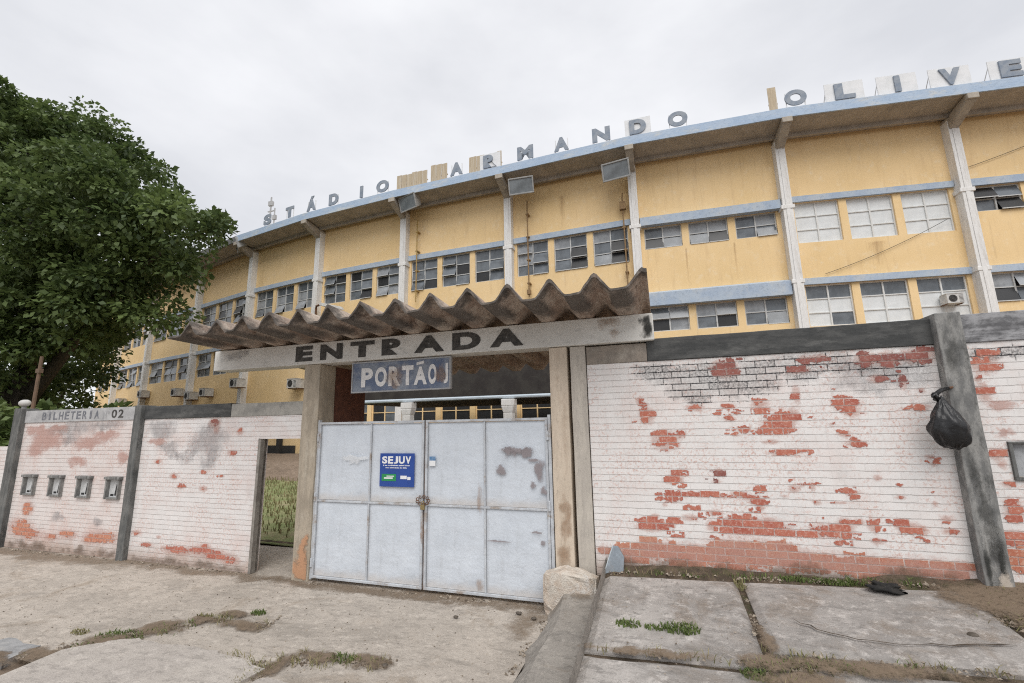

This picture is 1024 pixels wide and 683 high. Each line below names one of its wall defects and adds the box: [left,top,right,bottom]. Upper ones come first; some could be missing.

peeling [708,357,743,377]
peeling [786,356,831,373]
peeling [854,346,935,411]
peeling [970,348,1004,397]
peeling [632,398,685,452]
peeling [713,392,814,456]
peeling [831,388,868,448]
peeling [496,446,547,495]
peeling [12,503,114,543]
peeling [166,544,236,564]
peeling [598,469,976,581]
peeling [999,482,1024,587]